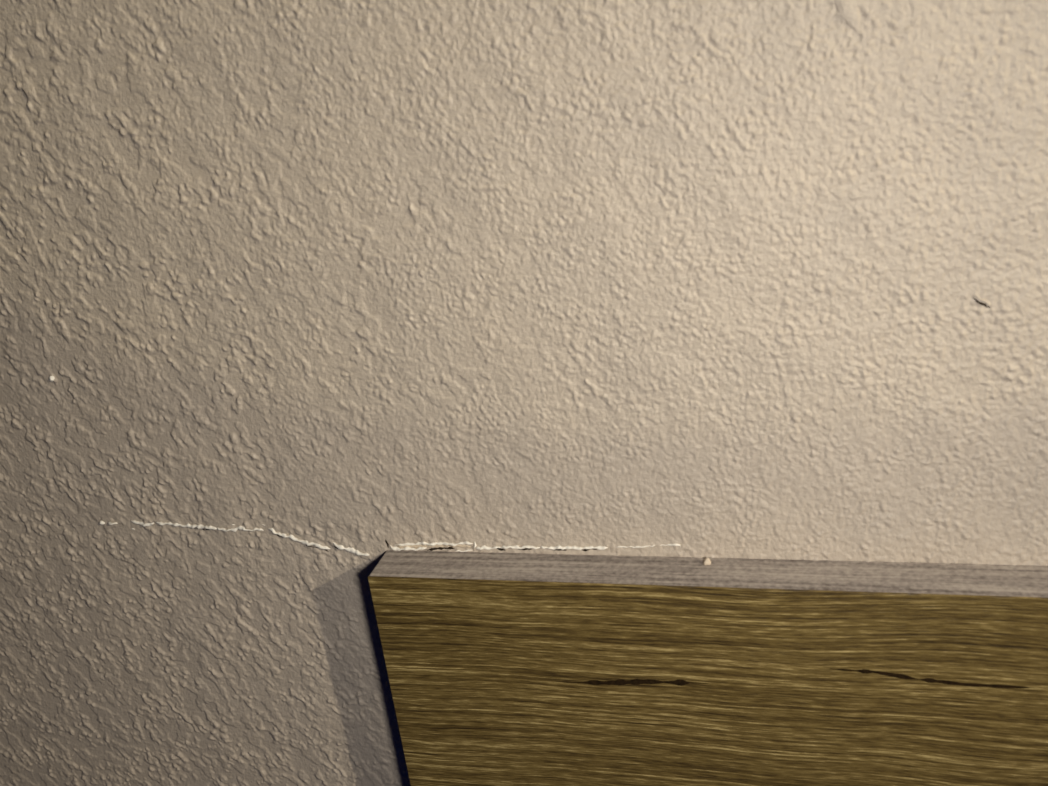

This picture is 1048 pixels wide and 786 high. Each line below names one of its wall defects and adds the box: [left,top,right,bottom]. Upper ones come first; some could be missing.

crack [99,520,369,556]